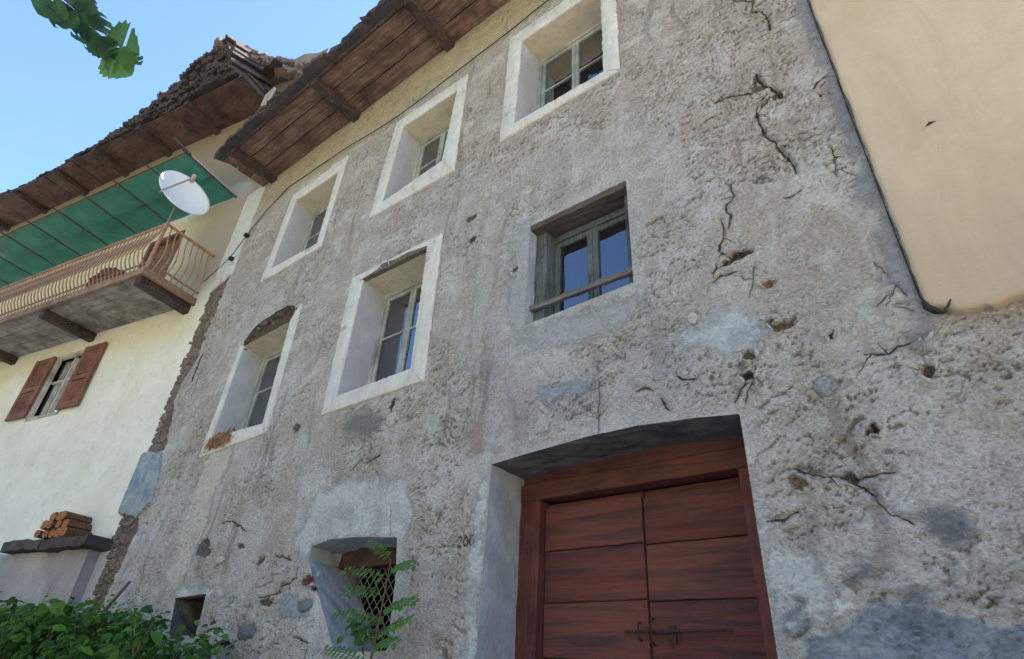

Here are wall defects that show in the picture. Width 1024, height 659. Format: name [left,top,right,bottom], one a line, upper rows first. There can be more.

crack [733,0,771,31]
crack [704,74,801,199]
crack [712,183,754,297]
flaking render [717,246,758,268]
crack [857,339,917,375]
crack [795,468,914,525]